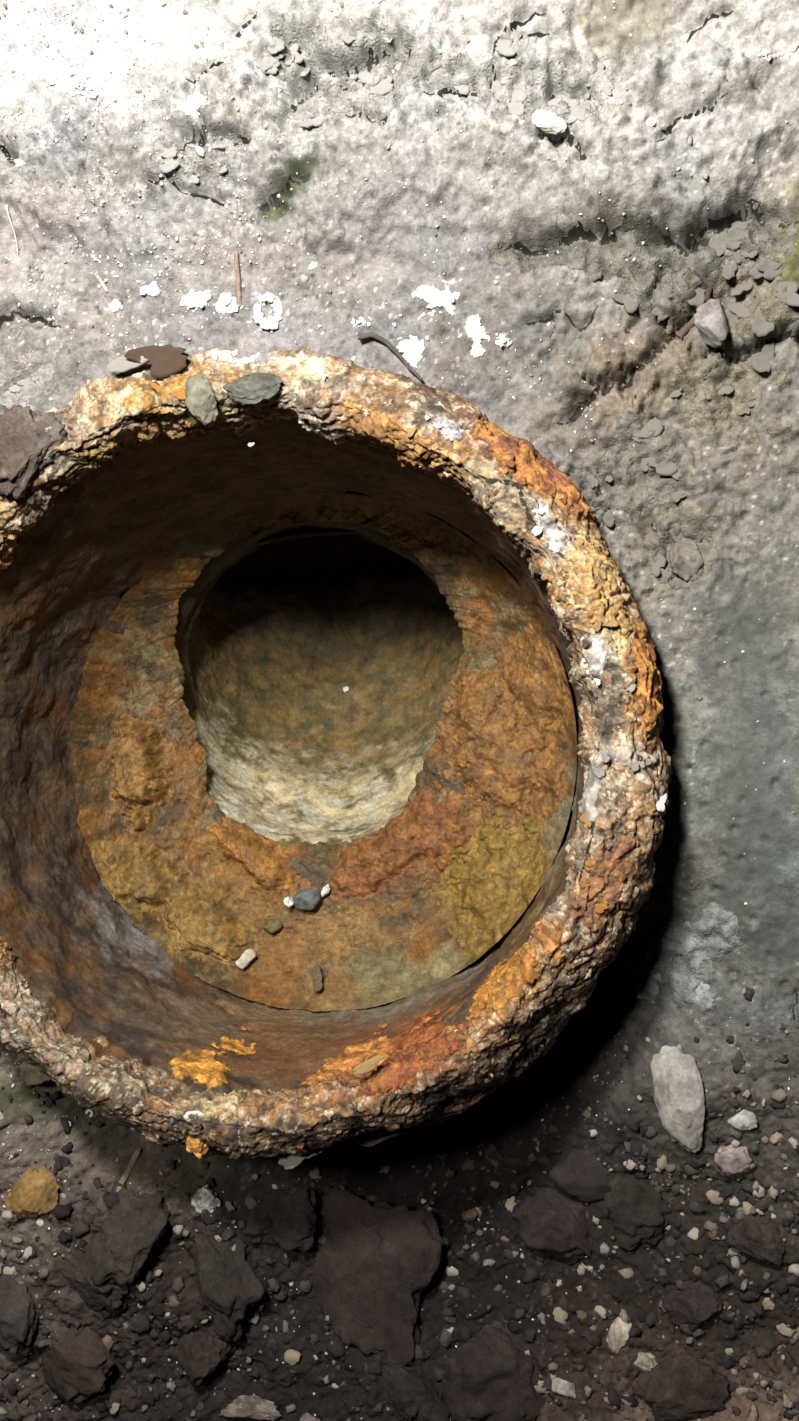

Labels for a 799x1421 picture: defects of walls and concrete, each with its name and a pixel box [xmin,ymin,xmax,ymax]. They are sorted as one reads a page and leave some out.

damp [108,299,121,313]
damp [140,281,160,297]
efflorescence [180,289,283,330]
efflorescence [396,335,425,368]
efflorescence [411,280,512,357]
rust [61,344,227,471]
rust [344,402,451,481]
rust [472,413,664,734]
rust [197,617,575,904]
rust [568,830,653,928]
rust [300,914,569,1097]
rust [169,1026,257,1088]